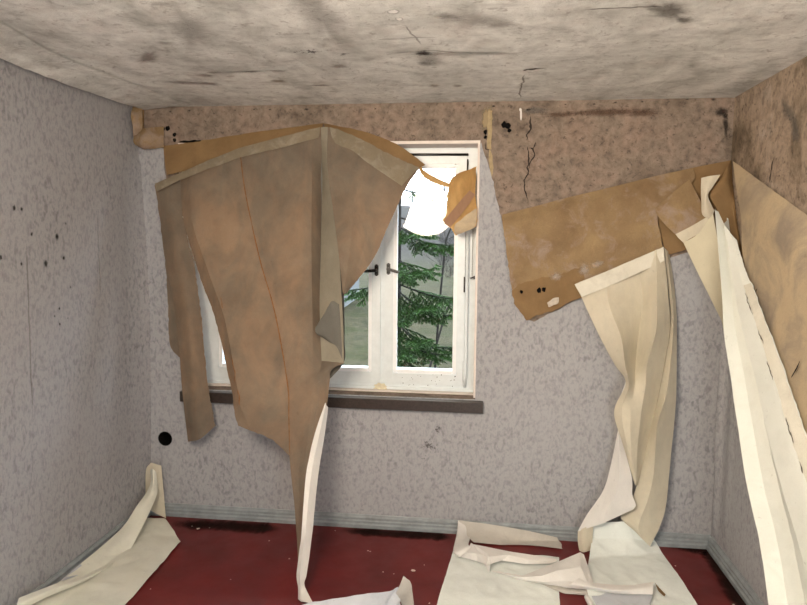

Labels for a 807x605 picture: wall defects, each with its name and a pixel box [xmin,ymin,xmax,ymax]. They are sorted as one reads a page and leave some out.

damp [654,5,688,22]
peeling [144,56,807,247]
crack [523,116,536,199]
peeling [530,297,575,322]
spalling [158,432,172,446]